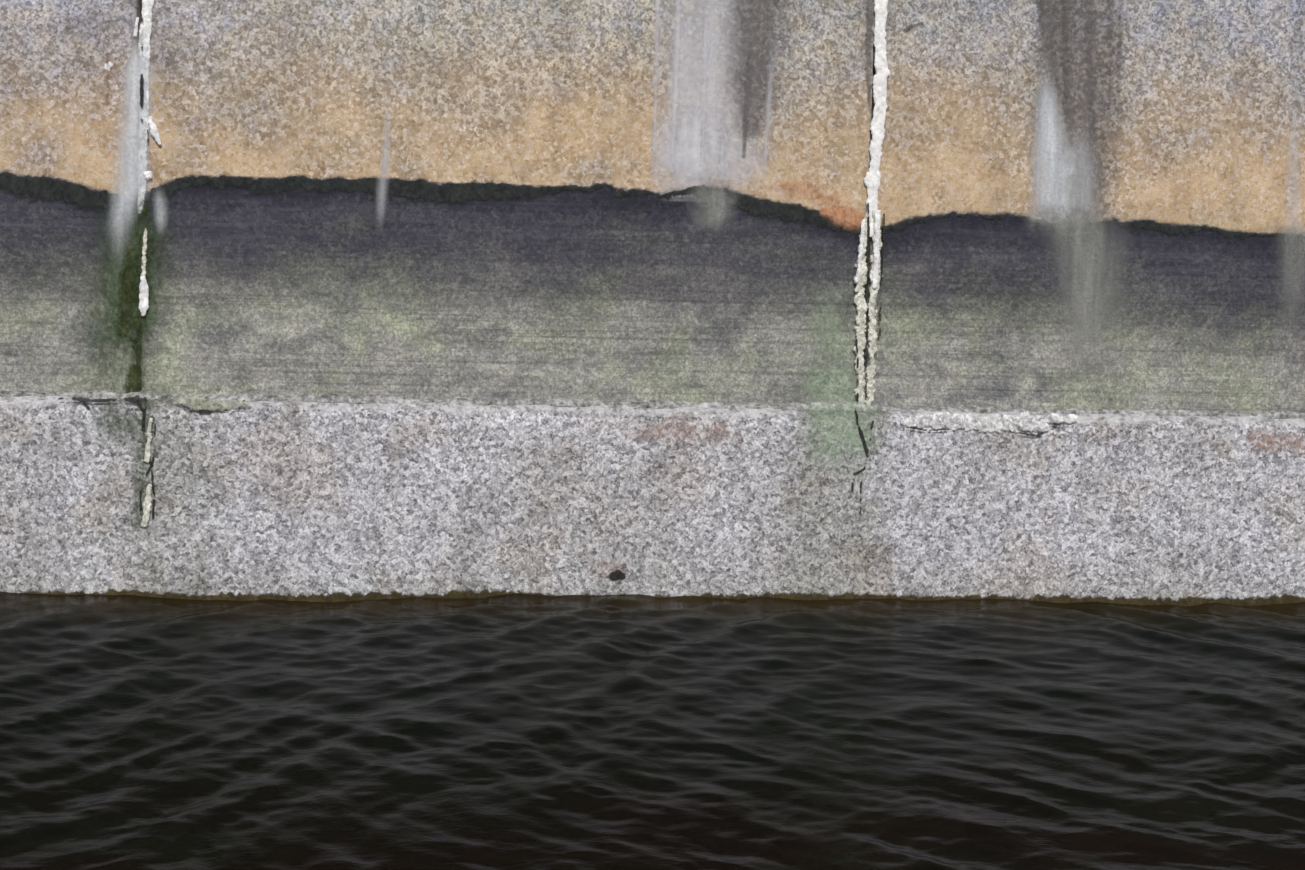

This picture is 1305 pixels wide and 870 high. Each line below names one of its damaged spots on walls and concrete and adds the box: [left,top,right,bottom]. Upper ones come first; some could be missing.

leakage [0,0,1305,407]
crack [58,396,156,527]